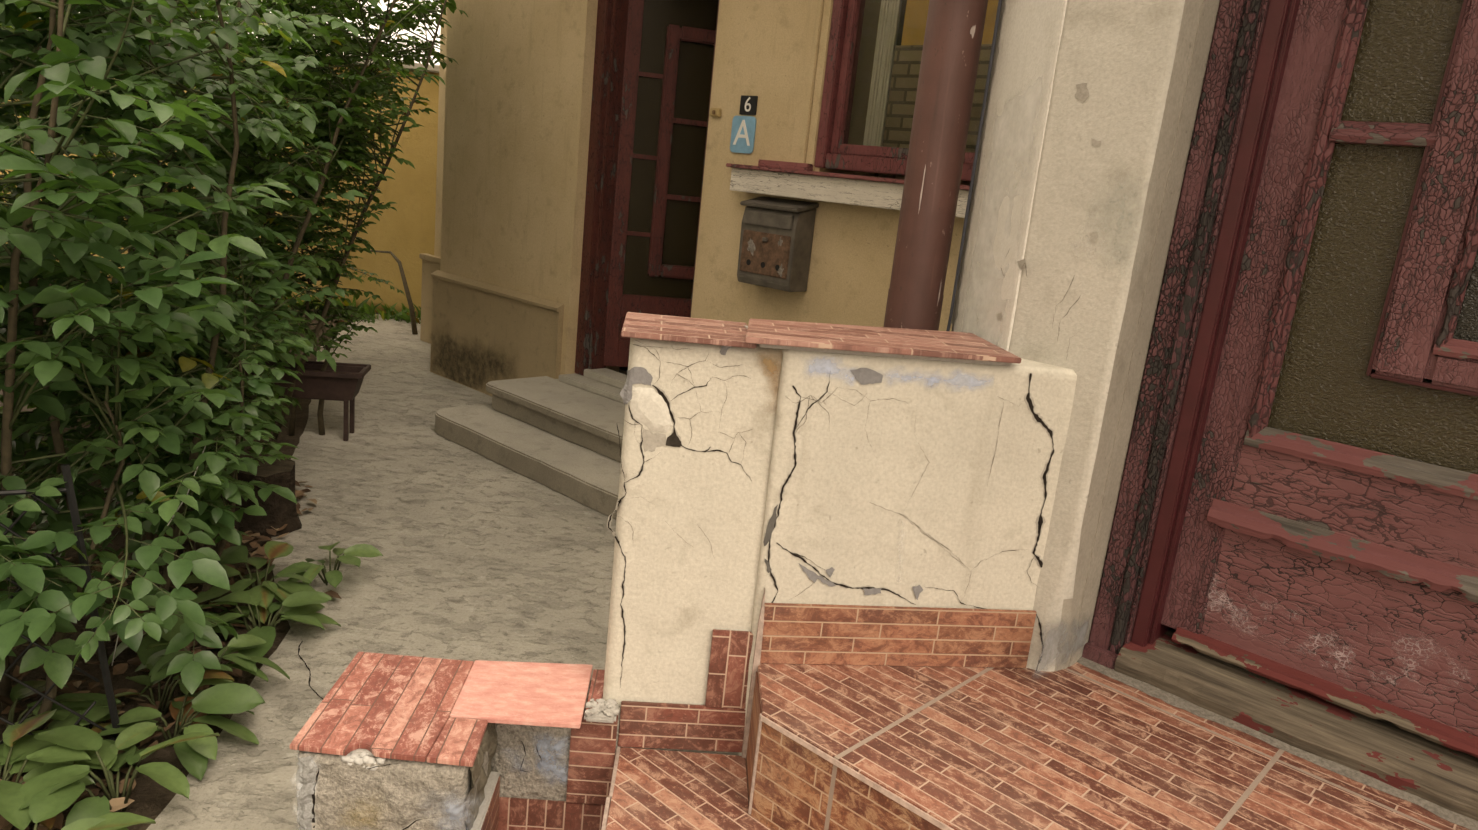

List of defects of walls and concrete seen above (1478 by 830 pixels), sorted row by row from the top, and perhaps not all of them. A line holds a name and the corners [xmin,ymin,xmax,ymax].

peeling [619,367,681,452]
crack [607,340,1055,688]